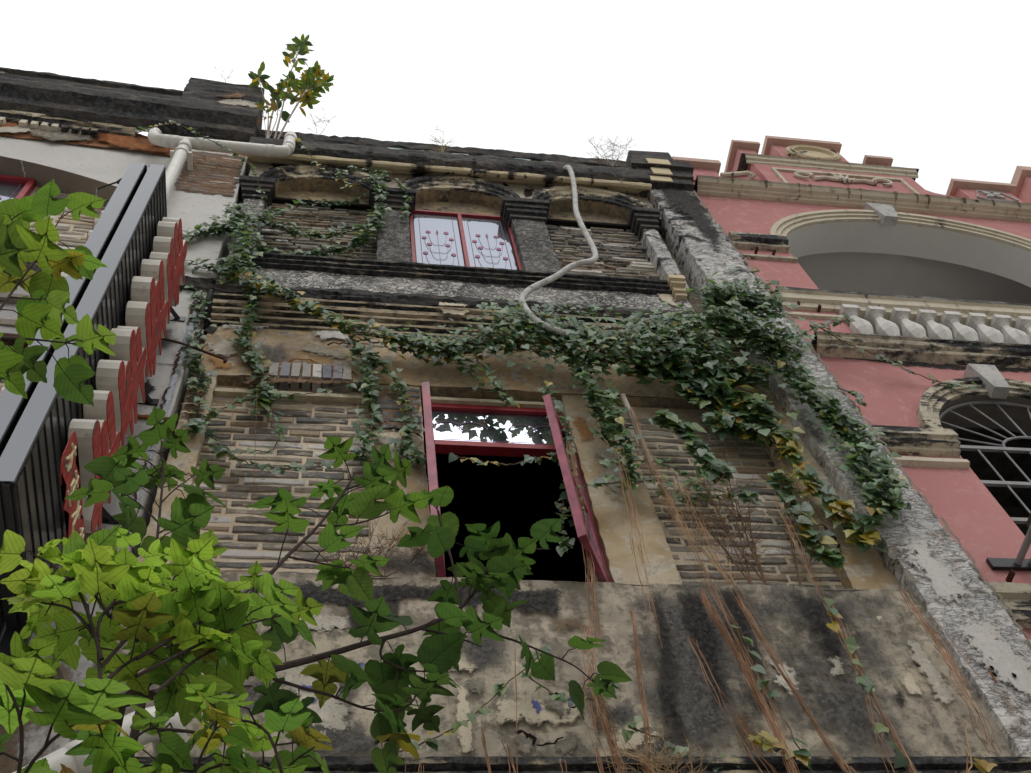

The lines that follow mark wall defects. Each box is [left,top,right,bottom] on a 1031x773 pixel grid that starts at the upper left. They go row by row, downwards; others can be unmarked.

flaking render [0,110,170,154]
leakage [654,188,729,248]
peeling [811,347,1031,706]
peeling [299,613,351,633]
peeling [276,659,362,739]
peeling [454,684,473,753]
peeling [450,652,479,673]
peeling [494,695,581,757]
leakage [608,704,636,728]
peeling [610,710,659,755]
leakage [634,581,919,756]
peeling [767,659,800,695]